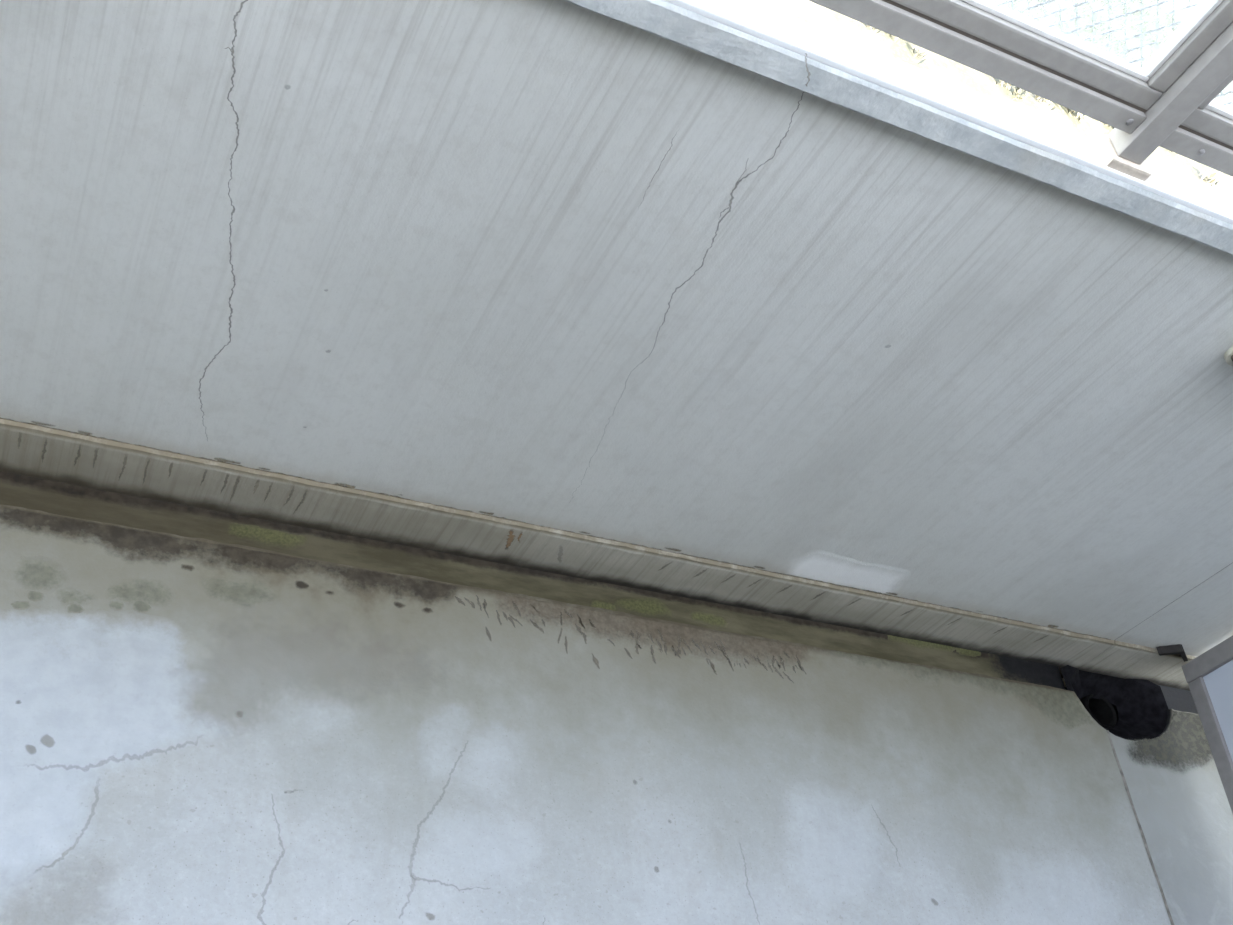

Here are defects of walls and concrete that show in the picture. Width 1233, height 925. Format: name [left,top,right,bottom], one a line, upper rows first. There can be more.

crack [199,0,248,441]
crack [569,53,810,503]
damp [0,505,1097,924]
damp [1129,711,1212,771]